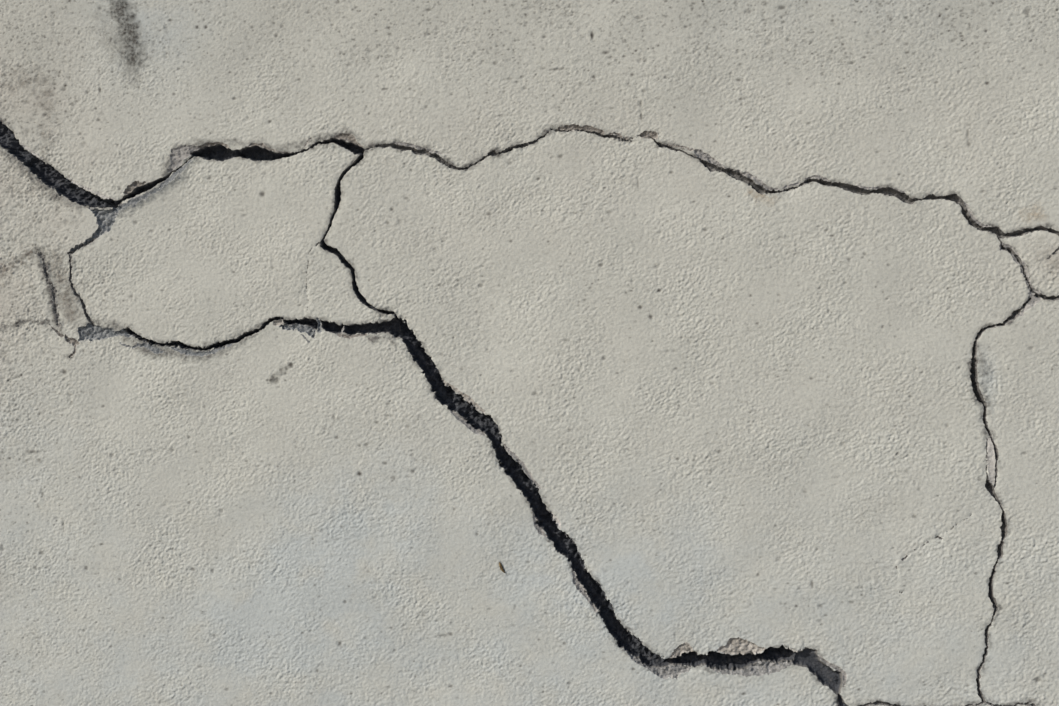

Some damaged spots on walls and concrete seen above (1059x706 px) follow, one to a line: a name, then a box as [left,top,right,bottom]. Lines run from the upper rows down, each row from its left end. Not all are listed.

crack [0,120,901,706]
crack [650,137,1059,706]